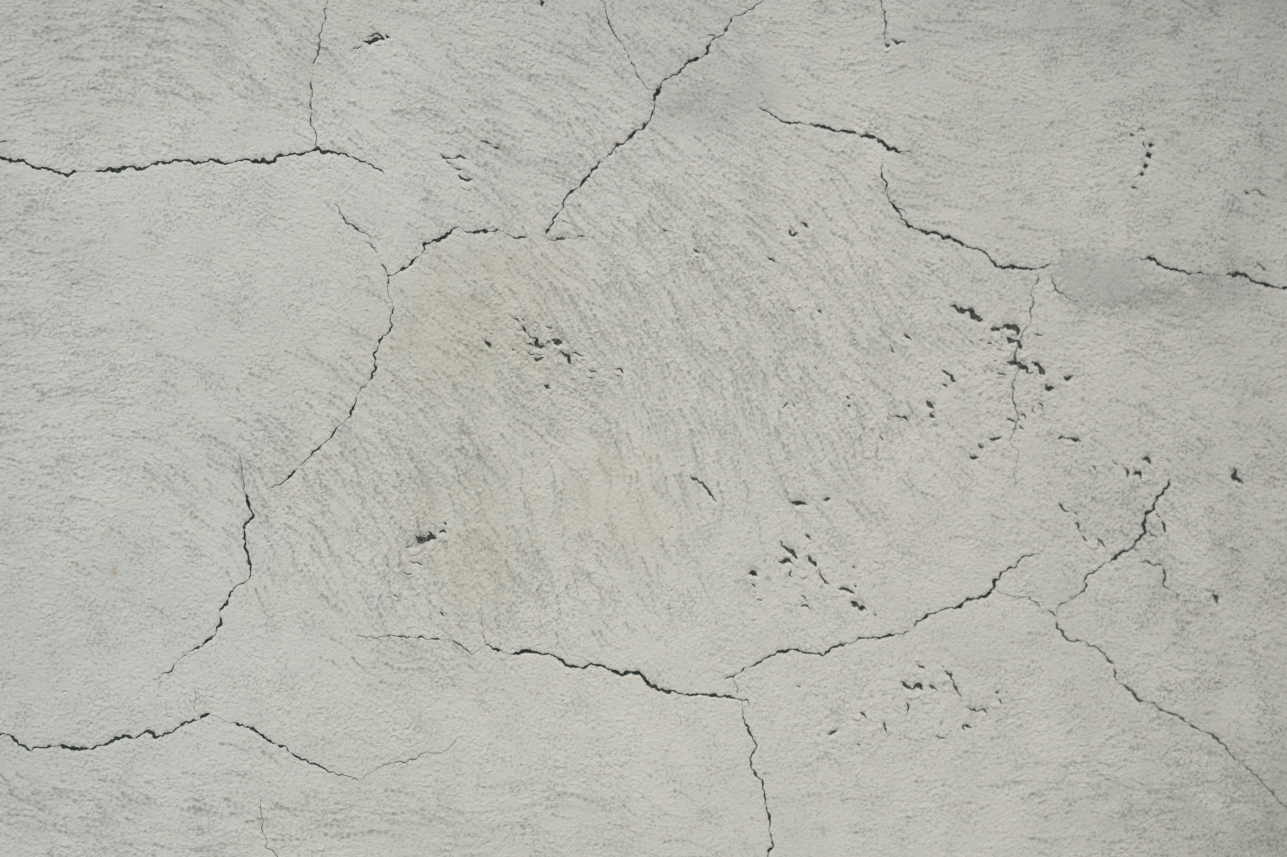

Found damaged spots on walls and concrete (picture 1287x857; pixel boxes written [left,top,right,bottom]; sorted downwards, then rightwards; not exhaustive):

crack [0,0,384,177]
crack [879,0,887,36]
crack [155,0,763,680]
crack [759,107,1080,481]
crack [1140,256,1287,290]
crack [0,693,456,779]
crack [358,478,1287,857]
crack [260,798,278,857]